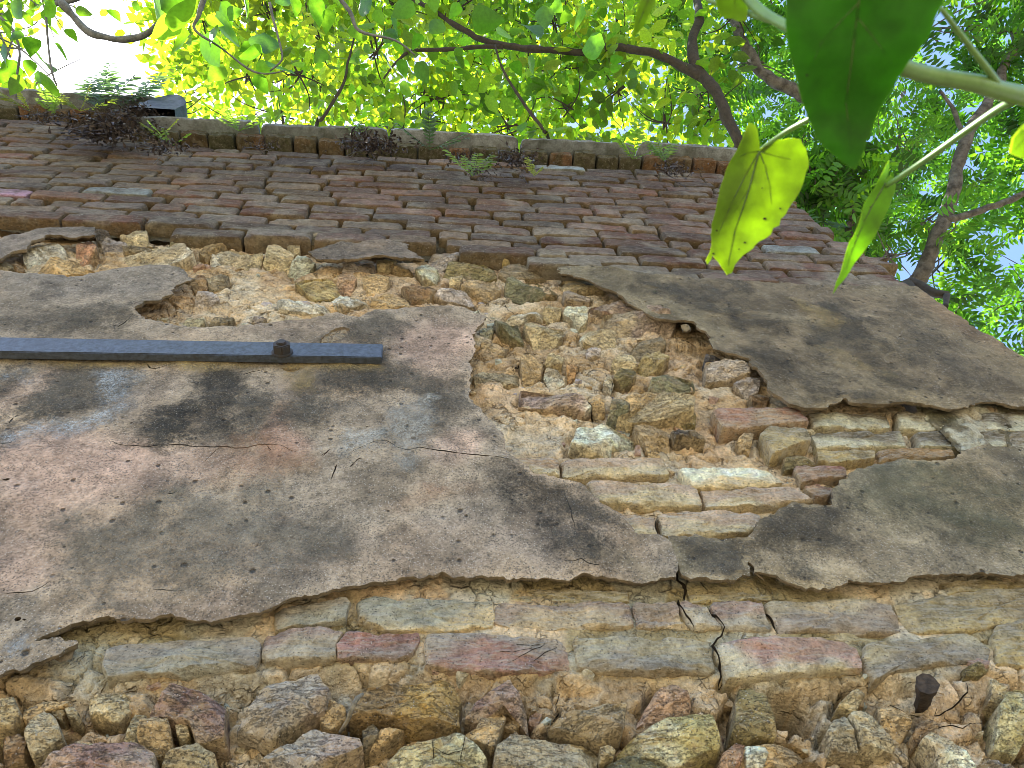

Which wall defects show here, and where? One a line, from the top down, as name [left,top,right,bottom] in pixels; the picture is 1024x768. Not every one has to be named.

water stain [136,313,483,470]
spalling [0,228,1024,540]
spalling [0,558,1024,768]
crack [676,573,725,690]